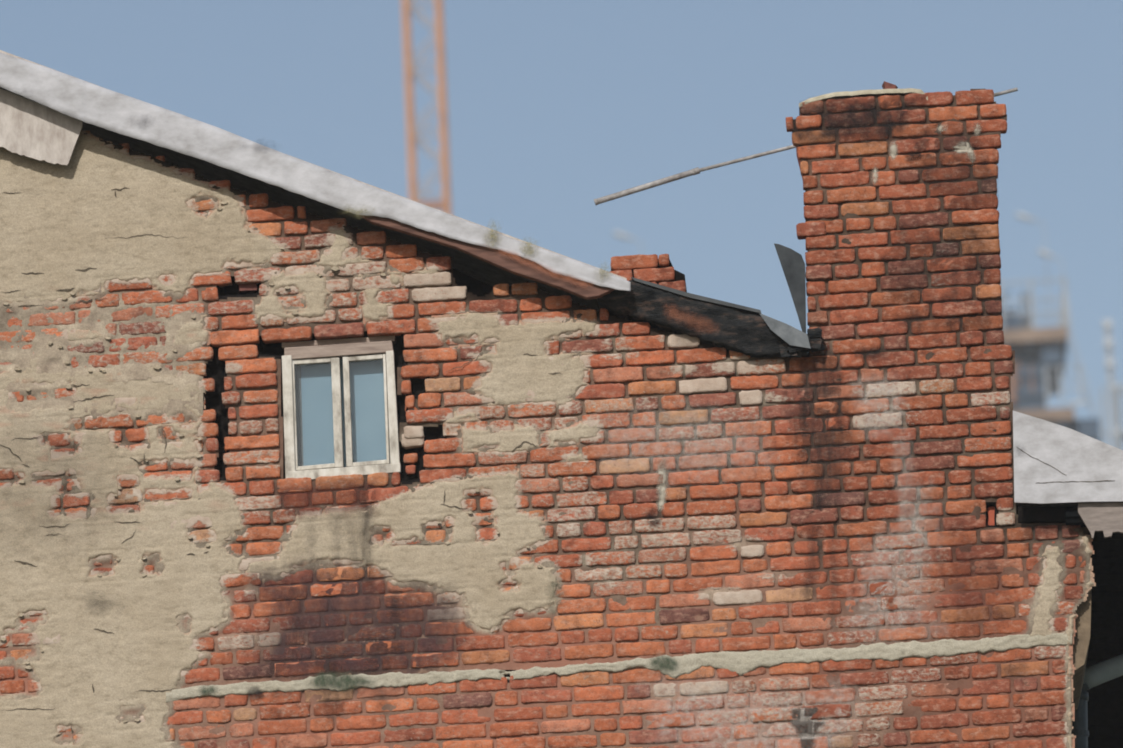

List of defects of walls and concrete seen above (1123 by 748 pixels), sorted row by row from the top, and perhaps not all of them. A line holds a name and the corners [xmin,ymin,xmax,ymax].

crack [252,336,265,351]
crack [203,344,232,481]
peeling [0,133,601,748]
water stain [270,577,453,677]
peeling [1030,546,1063,636]
peeling [1066,535,1096,748]